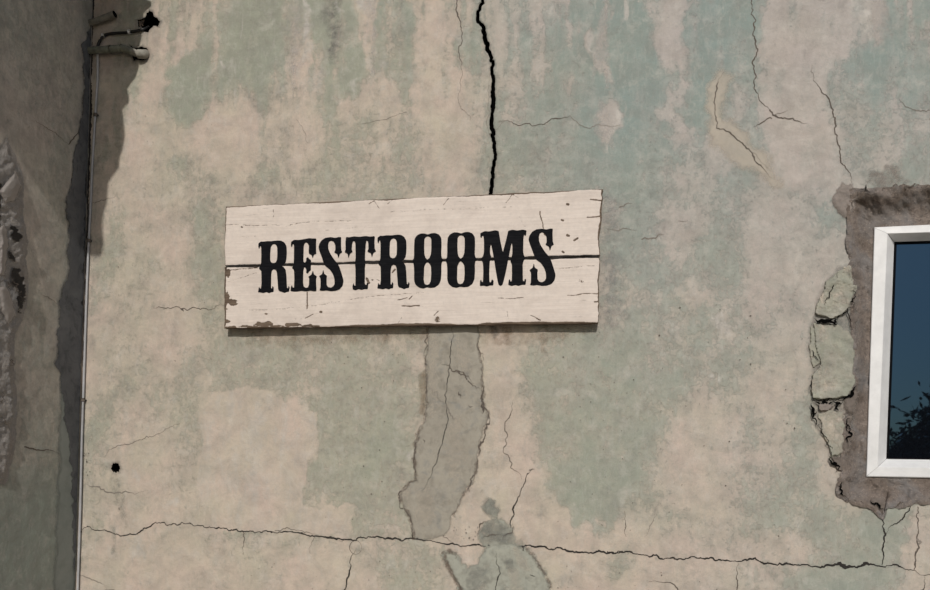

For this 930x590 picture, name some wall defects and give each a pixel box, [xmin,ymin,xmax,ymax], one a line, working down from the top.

crack [455,0,616,195]
crack [714,0,805,178]
crack [812,72,852,179]
peeling [0,171,21,203]
flaking render [832,183,928,218]
flaking render [0,224,26,324]
flaking render [808,265,903,515]
crack [90,486,144,494]
crack [503,403,930,590]
crack [81,522,501,590]